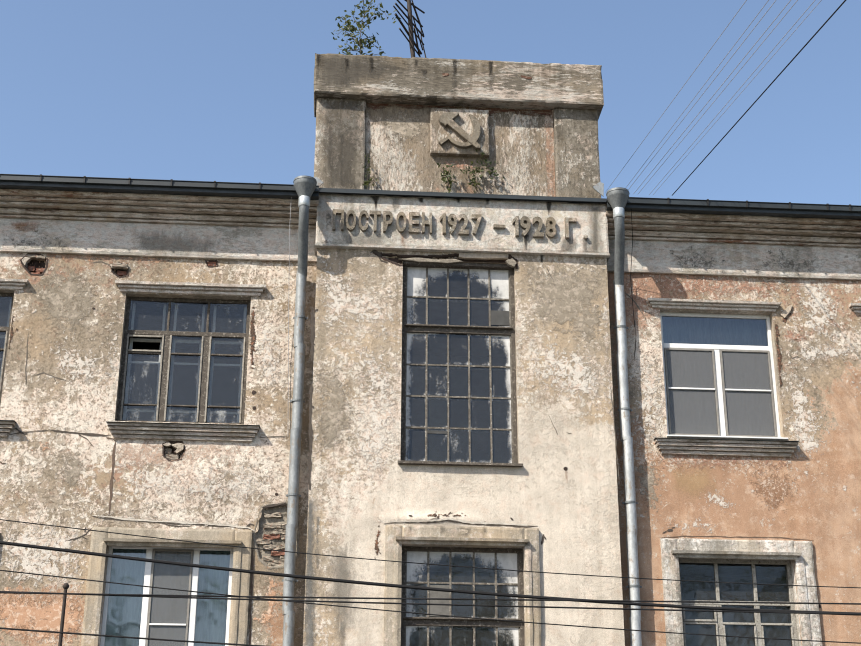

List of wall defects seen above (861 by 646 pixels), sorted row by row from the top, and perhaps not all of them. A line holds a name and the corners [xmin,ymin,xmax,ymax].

peeling [20,253,168,396]
peeling [373,252,614,441]
peeling [624,276,646,316]
peeling [630,275,857,510]
crack [9,429,255,645]
peeling [97,439,300,631]
spalling [375,512,466,555]
peeling [705,489,736,515]